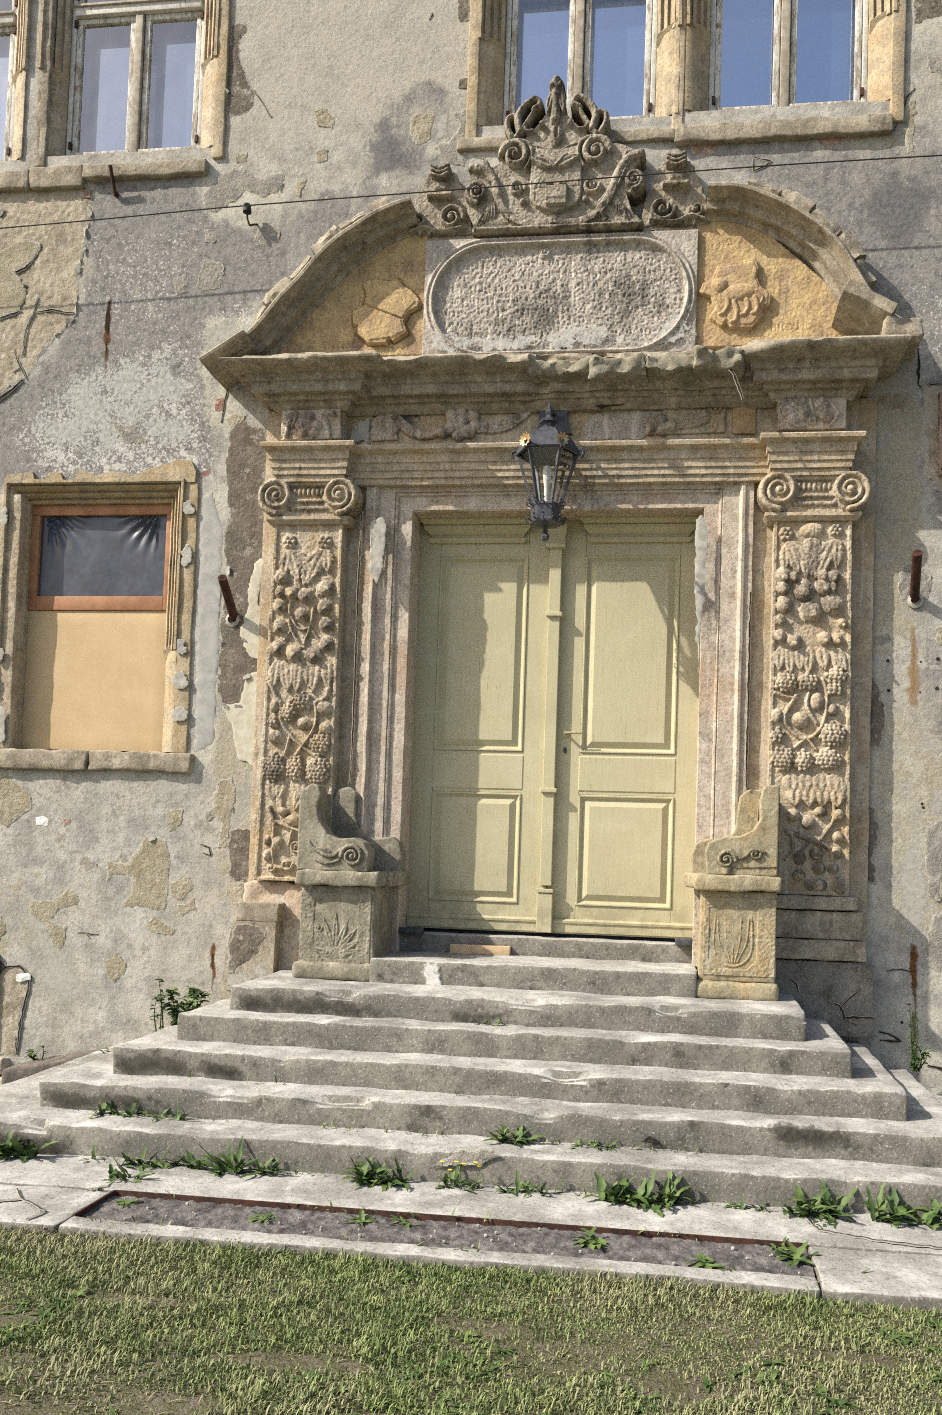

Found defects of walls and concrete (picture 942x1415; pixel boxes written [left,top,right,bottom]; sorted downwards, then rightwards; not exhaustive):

flaking render [912,0,942,24]
crack [0,261,74,401]
flaking render [0,182,92,394]
flaking render [194,398,267,752]
flaking render [96,808,196,935]
flaking render [923,820,942,973]